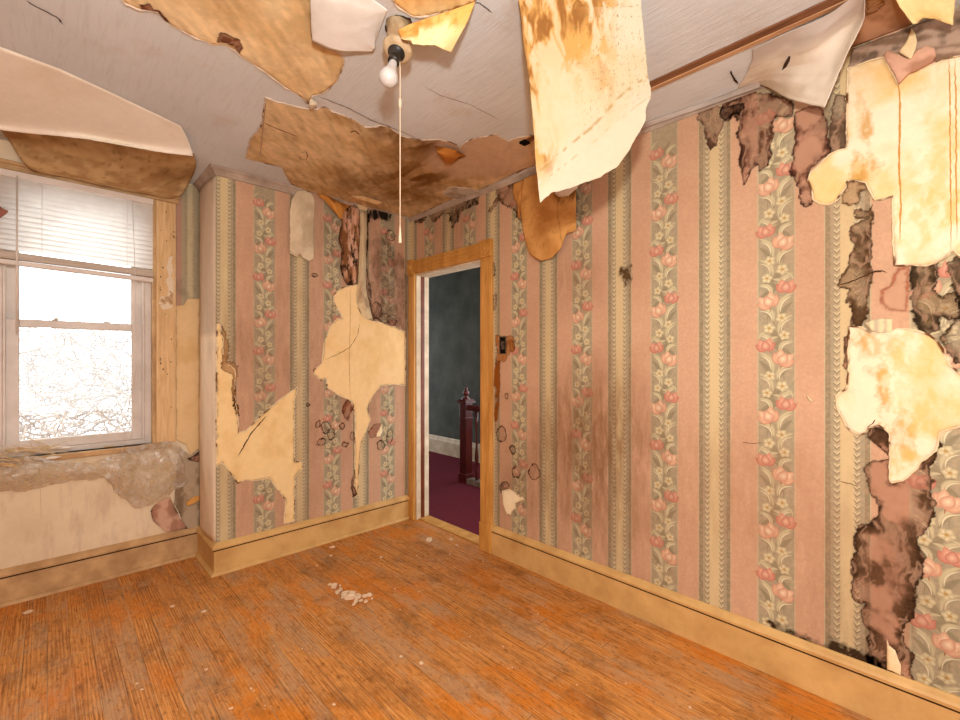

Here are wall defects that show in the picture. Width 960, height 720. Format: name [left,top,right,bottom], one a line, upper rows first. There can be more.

flaking render [1,130,196,199]
flaking render [121,0,536,218]
flaking render [807,55,960,267]
spalling [150,495,200,532]
flaking render [215,323,303,524]
flaking render [313,284,406,497]
flaking render [499,481,524,516]
leakage [829,420,943,681]
flaking render [835,326,960,484]